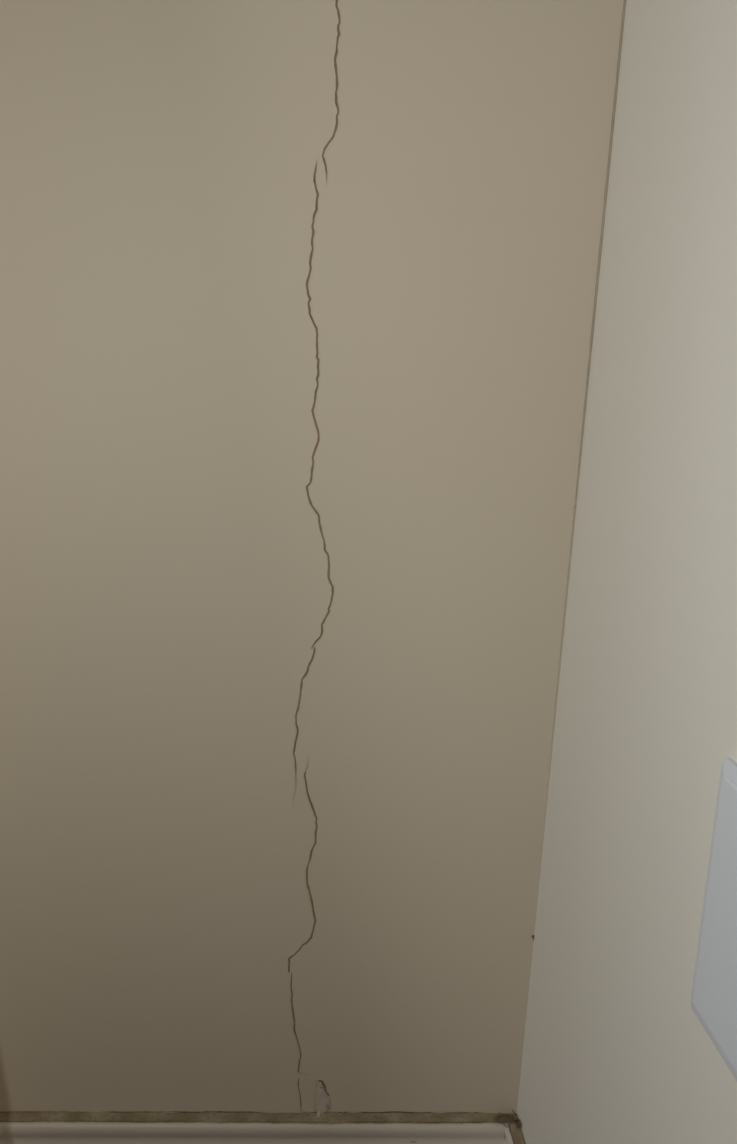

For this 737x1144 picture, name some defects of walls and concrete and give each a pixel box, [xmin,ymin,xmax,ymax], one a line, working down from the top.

crack [286,0,342,1113]